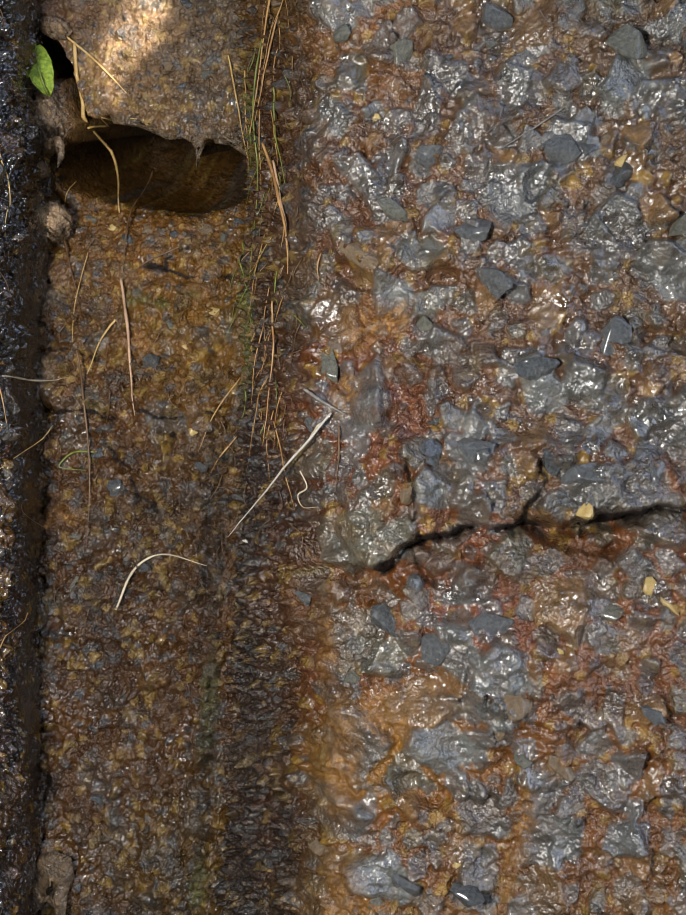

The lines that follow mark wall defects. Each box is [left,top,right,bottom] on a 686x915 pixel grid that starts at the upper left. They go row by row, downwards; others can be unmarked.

crack [374,458,469,585]
crack [493,462,686,530]
damp [219,730,293,915]